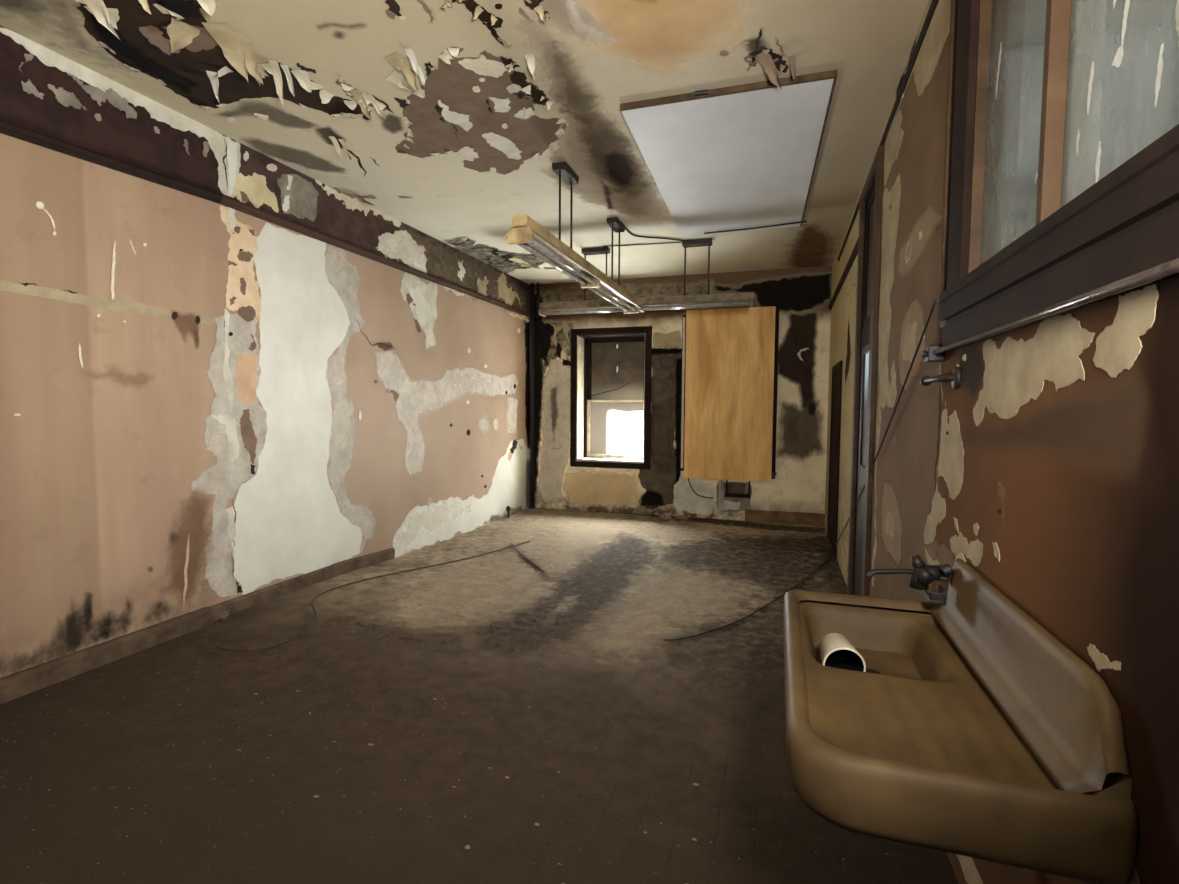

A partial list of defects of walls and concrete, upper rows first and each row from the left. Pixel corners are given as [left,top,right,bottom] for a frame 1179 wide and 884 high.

water stain [520,0,739,216]
spalling [719,28,796,89]
flaking render [0,0,570,595]
water stain [622,224,833,459]
peeling [872,110,925,586]
peeling [973,284,1159,426]
water stain [0,595,132,674]
water stain [146,493,209,622]
peeling [924,409,1000,576]
peeling [957,854,983,884]